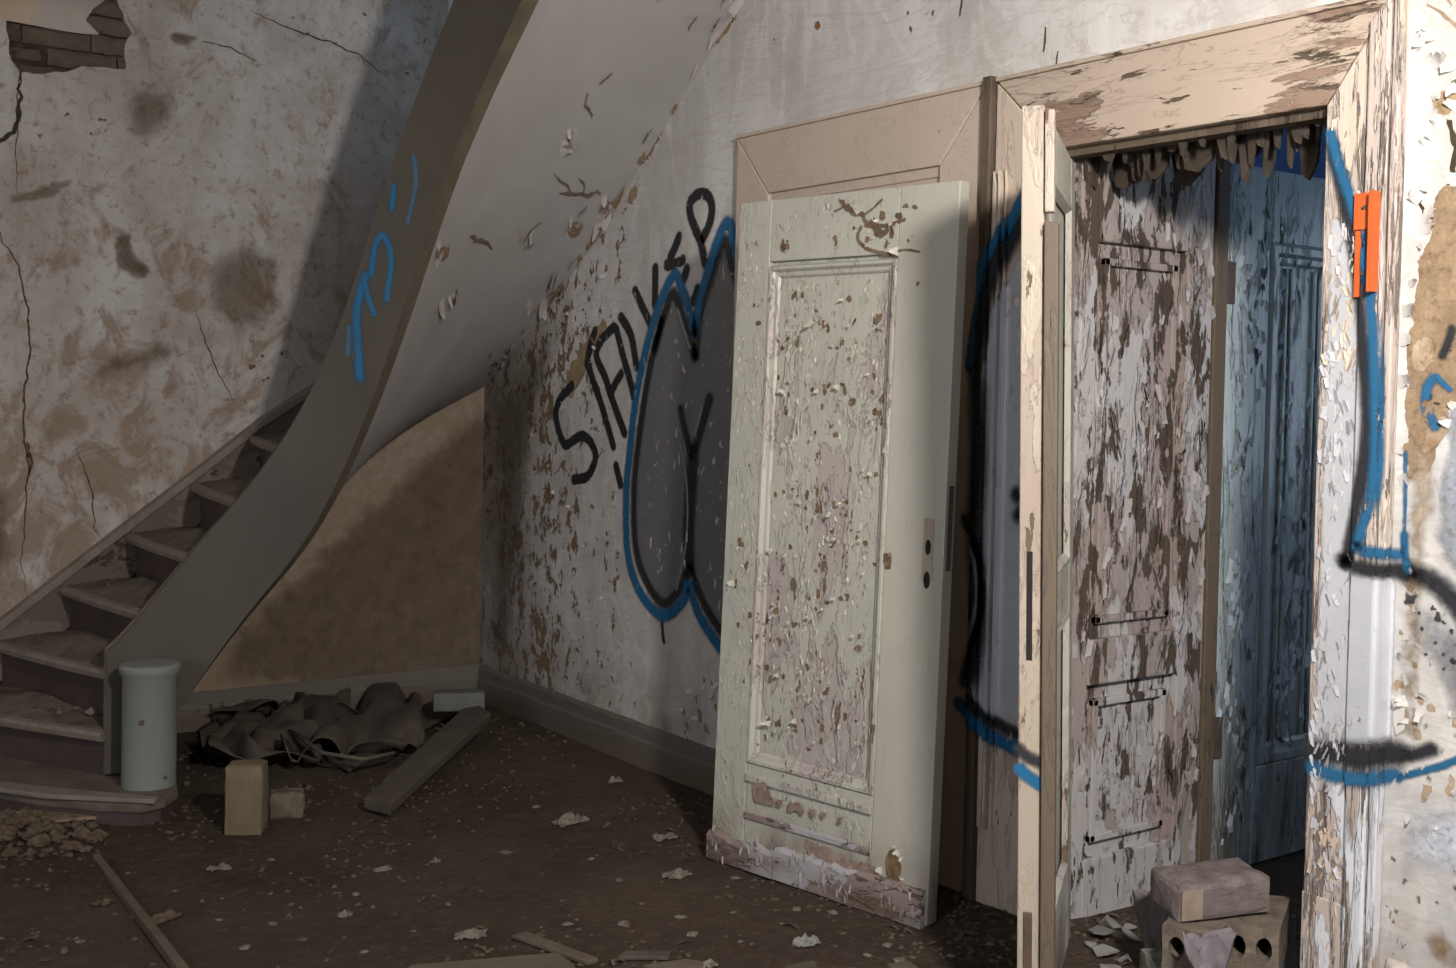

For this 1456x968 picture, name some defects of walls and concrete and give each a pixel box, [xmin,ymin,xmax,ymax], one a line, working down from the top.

crack [0,39,23,188]
spalling [6,0,131,74]
peeling [638,128,663,165]
peeling [689,0,746,78]
peeling [489,186,639,398]
crack [0,232,34,595]
peeling [1390,172,1456,740]
peeling [1403,774,1455,835]